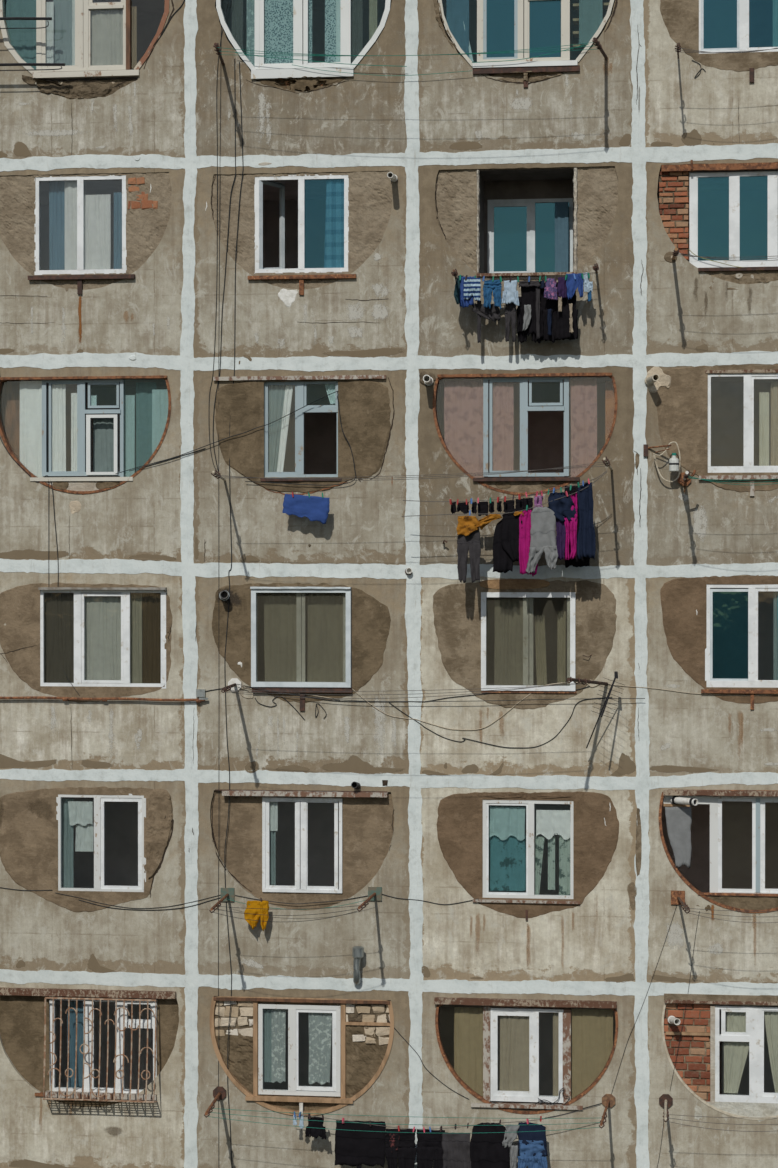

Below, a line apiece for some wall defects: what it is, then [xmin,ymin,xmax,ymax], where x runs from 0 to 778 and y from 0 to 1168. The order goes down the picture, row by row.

flaking render [128,177,158,209]